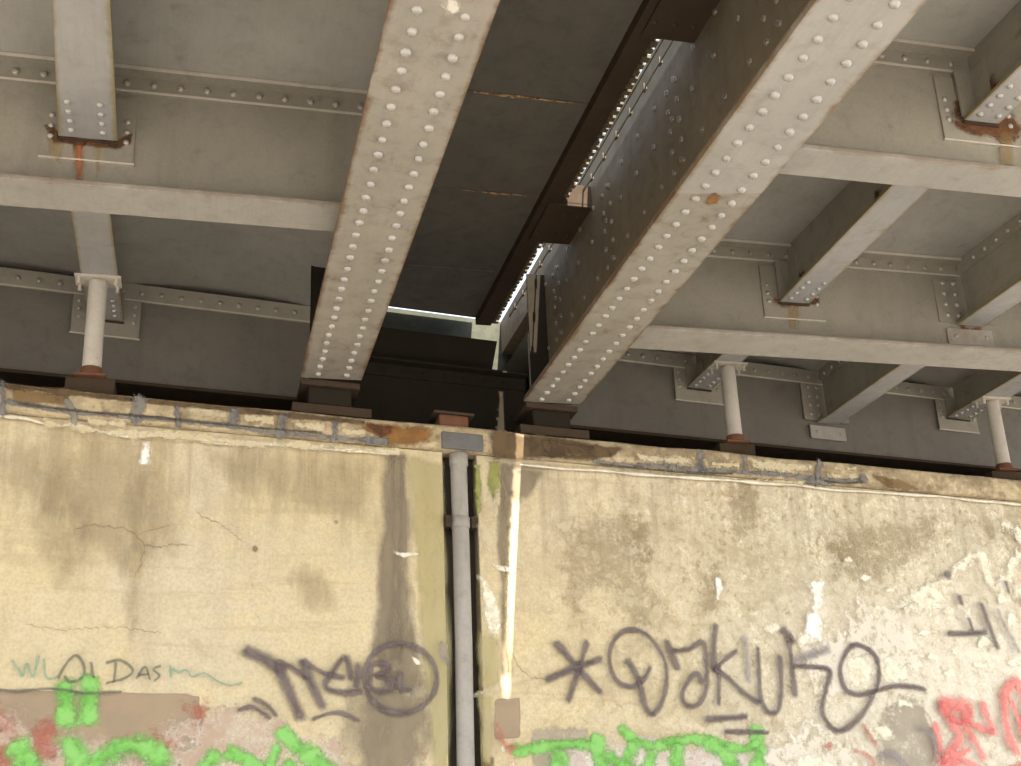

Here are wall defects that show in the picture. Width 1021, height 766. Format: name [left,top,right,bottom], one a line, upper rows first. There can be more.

rust [952,101,1021,144]
rust [45,125,132,180]
water stain [140,444,150,464]
rust [365,423,432,445]
crack [77,523,185,572]
water stain [475,430,620,685]
water stain [359,455,448,766]
peeling [798,521,1021,702]
water stain [481,697,493,766]
peeling [764,718,867,766]
peeling [866,726,891,740]